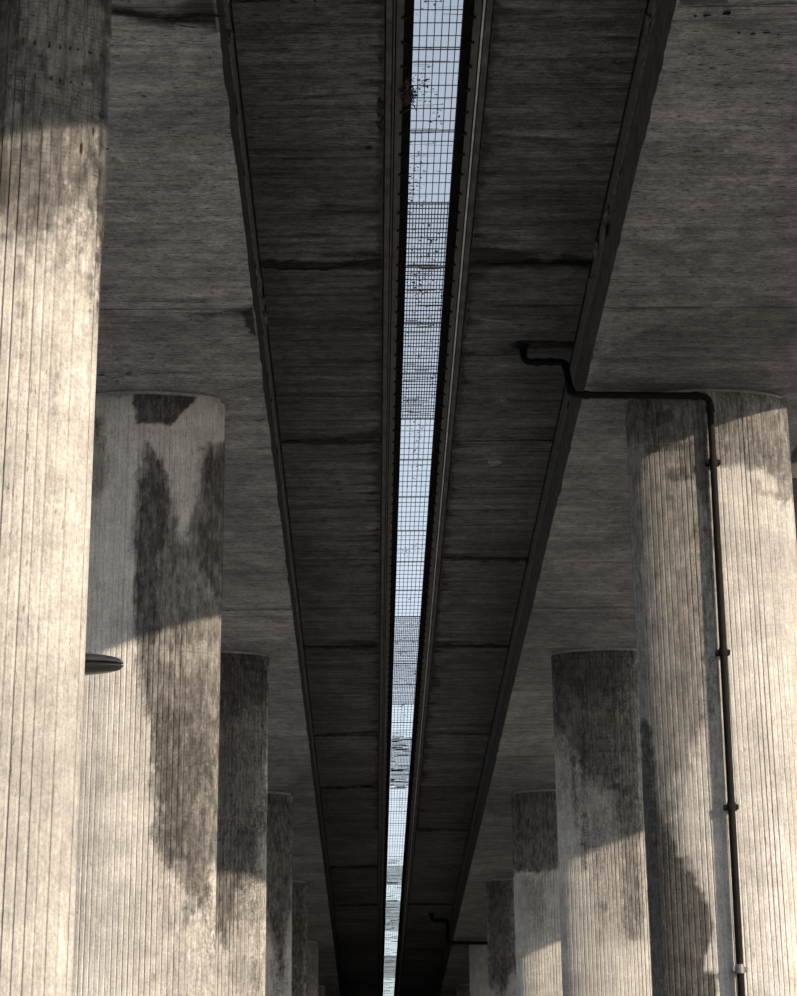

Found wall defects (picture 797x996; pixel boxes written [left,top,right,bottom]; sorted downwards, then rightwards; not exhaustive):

leakage [0,0,217,309]
leakage [134,445,326,996]
leakage [486,791,558,991]
leakage [551,392,788,996]